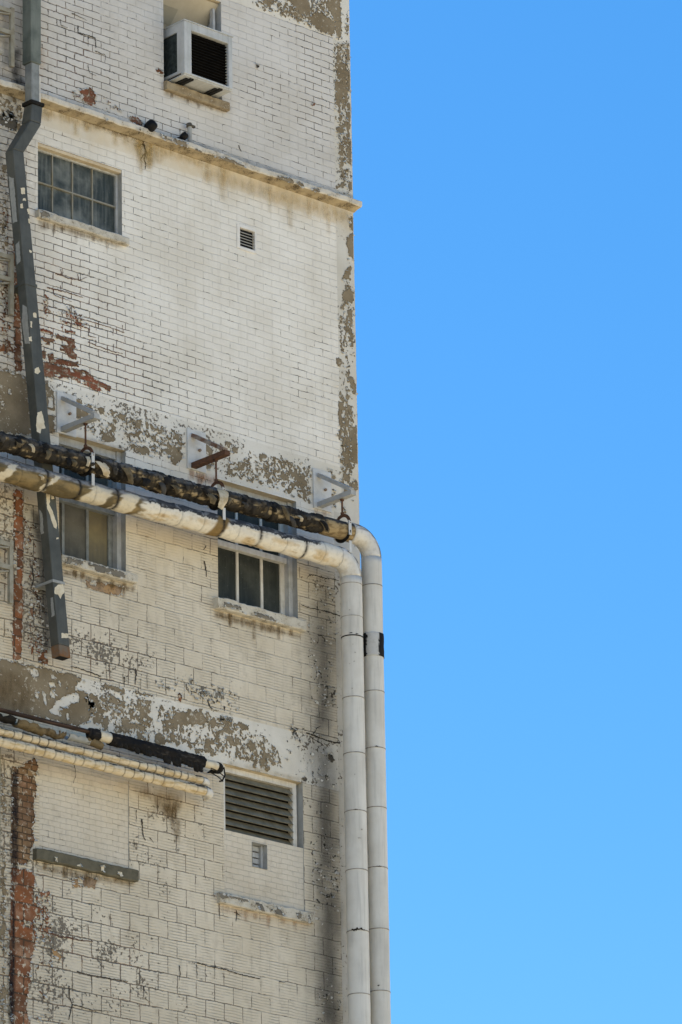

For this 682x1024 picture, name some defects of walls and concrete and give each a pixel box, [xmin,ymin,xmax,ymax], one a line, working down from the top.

flaking render [72,87,144,131]
peeling [252,0,353,196]
peeling [0,157,185,466]
peeling [206,441,313,504]
peeling [328,216,358,514]
peeling [0,489,338,787]
flaking render [0,758,62,1024]